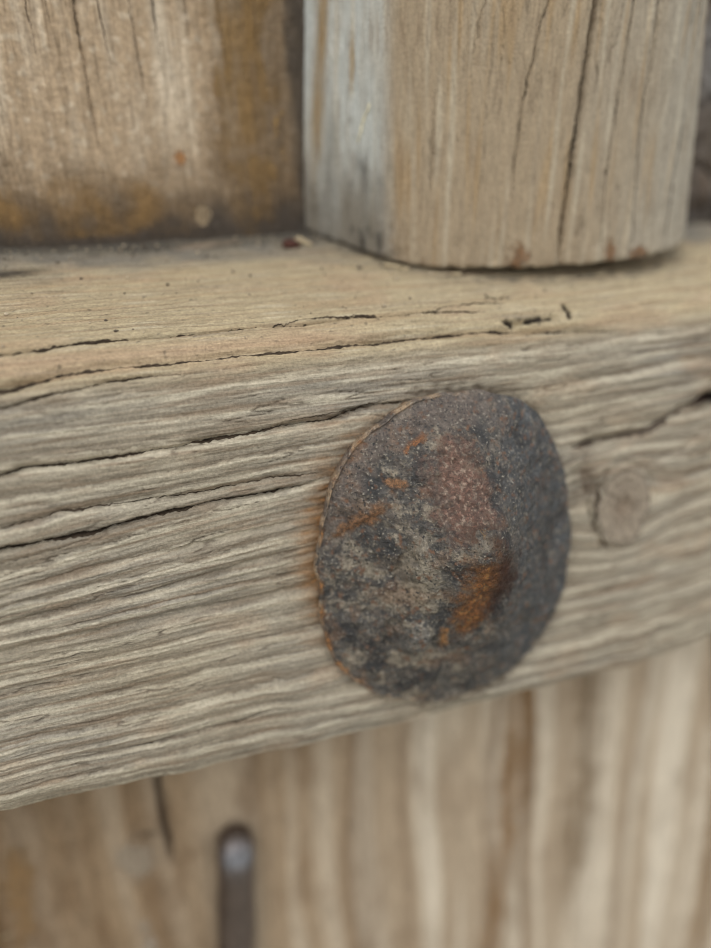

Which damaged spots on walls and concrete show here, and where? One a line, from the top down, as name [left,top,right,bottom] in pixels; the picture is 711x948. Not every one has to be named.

crack [73,1,99,149]
crack [98,3,110,64]
crack [128,0,166,109]
crack [565,51,586,191]
crack [0,302,621,409]
crack [571,407,685,449]
rust [428,437,497,541]
rust [441,545,518,643]